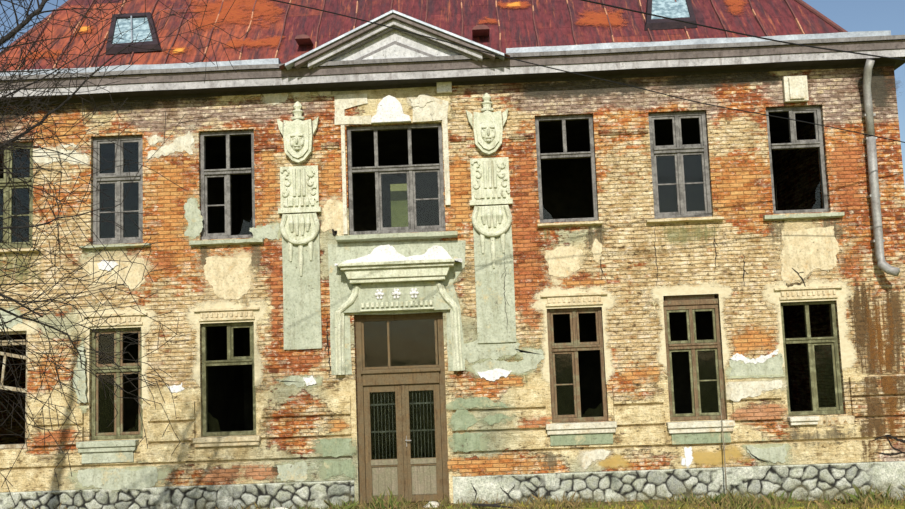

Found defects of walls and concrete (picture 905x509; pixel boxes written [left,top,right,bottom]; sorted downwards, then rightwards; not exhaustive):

rust [497,1,529,9]
rust [724,0,745,15]
rust [189,0,285,48]
rust [576,10,627,27]
peeling [407,94,432,107]
peeling [725,326,787,425]
leakage [849,281,905,462]
peeling [446,339,551,477]
leakage [792,428,849,445]
crack [872,435,905,456]